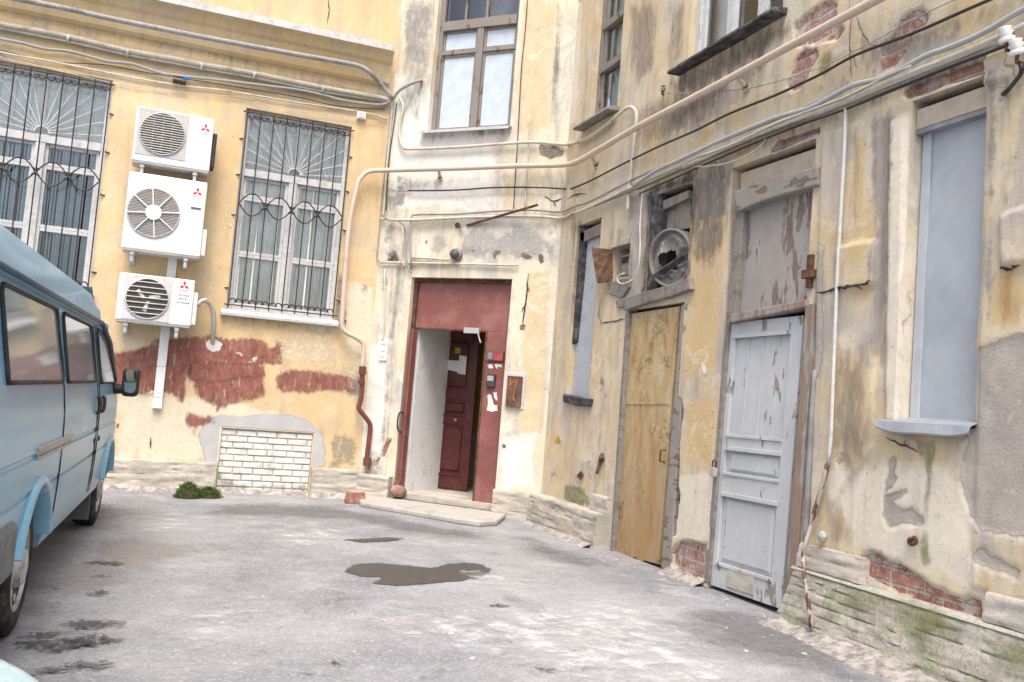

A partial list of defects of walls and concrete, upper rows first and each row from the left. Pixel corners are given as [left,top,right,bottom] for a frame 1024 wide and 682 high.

flaking render [789,1,844,90]
flaking render [880,10,929,72]
flaking render [539,145,564,159]
leakage [871,117,890,359]
flaking render [813,242,825,377]
crack [816,280,870,294]
peeling [186,339,356,427]
flaking render [960,332,1024,536]
flaking render [882,457,924,527]
flaking render [671,540,707,582]
flaking render [861,553,982,617]
flaking render [972,548,1019,577]